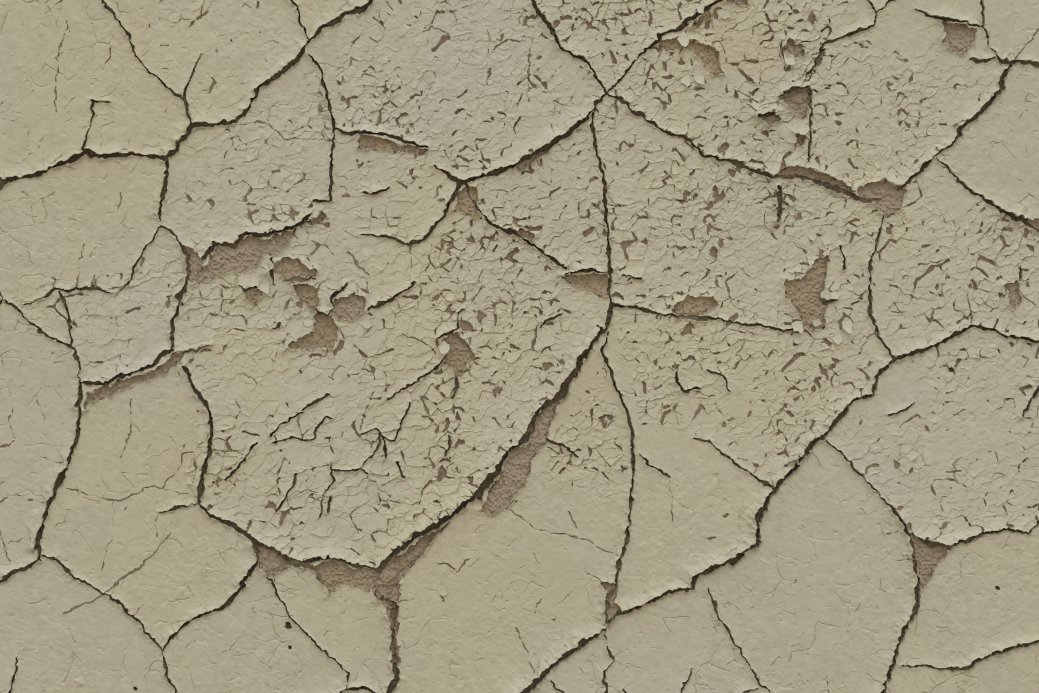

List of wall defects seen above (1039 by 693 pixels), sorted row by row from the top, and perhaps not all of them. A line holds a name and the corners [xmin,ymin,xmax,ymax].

crack [897,0,1039,243]
peeling [37,248,186,383]
crack [182,0,894,693]
peeling [85,0,1039,603]
spalling [381,601,400,666]
spalling [601,582,670,623]
crack [880,498,1039,693]